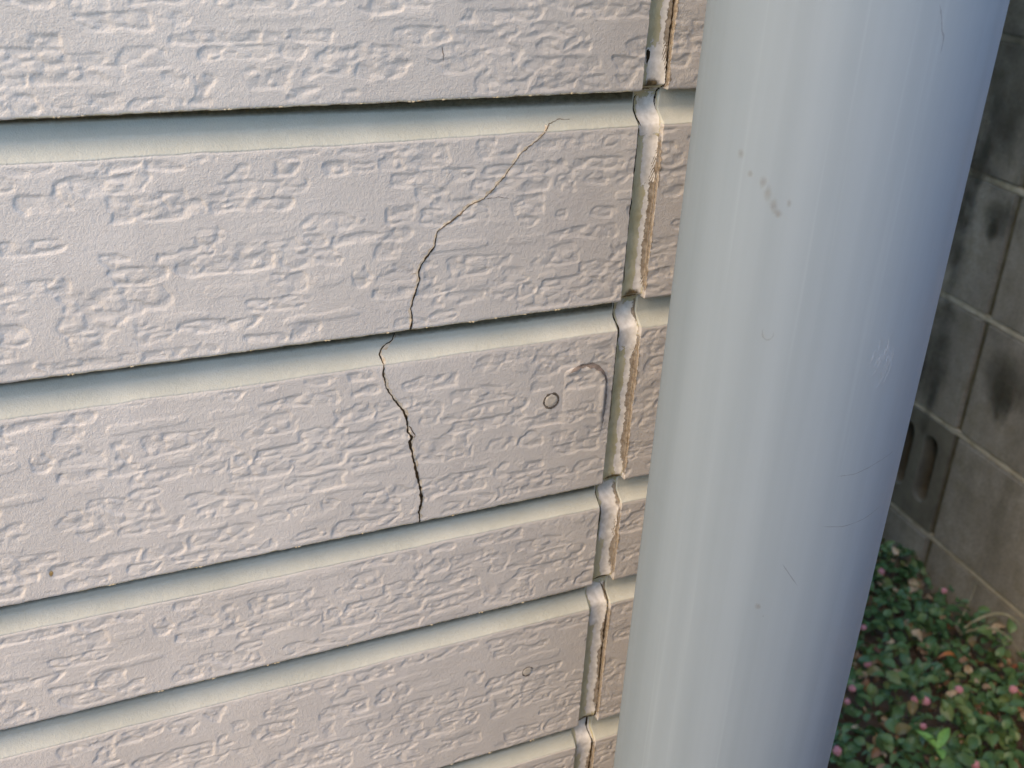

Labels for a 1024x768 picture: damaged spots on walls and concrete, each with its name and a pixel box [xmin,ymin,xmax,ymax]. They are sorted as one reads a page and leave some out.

peeling [11,0,670,768]
crack [379,118,569,522]